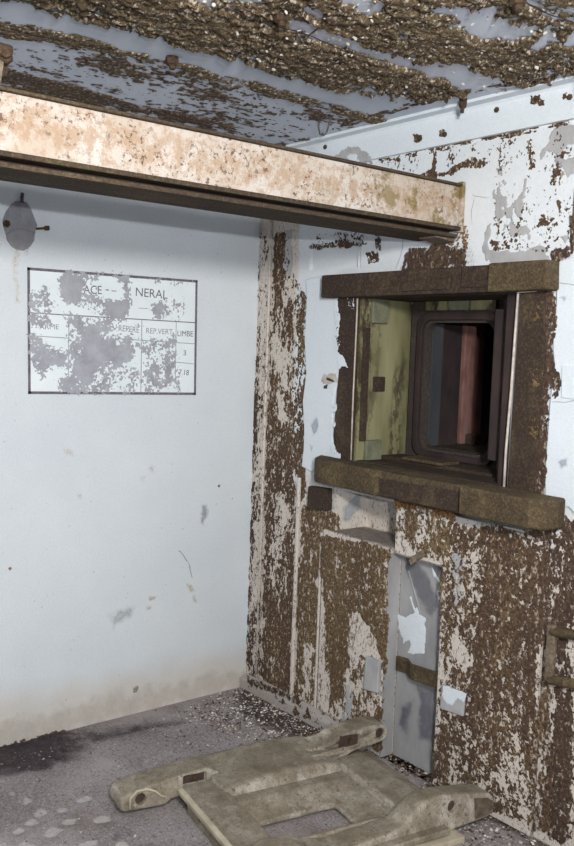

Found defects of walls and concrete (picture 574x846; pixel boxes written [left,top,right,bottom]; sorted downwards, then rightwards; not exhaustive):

rust [0,68,310,146]
peeling [8,46,357,134]
peeling [297,0,376,71]
rust [370,121,574,262]
peeling [482,162,550,263]
peeling [26,269,185,396]
rust [526,291,562,494]
peeling [246,229,332,730]
rust [260,230,392,723]
leakage [0,730,79,775]
leakage [93,725,164,740]
rust [394,500,574,845]